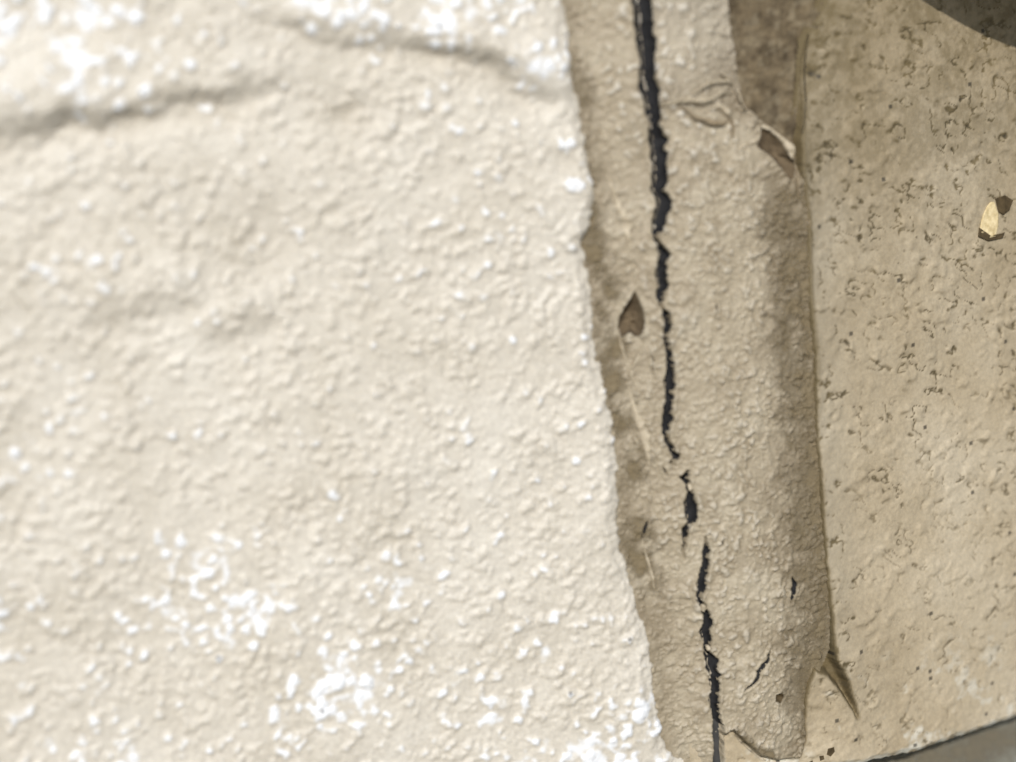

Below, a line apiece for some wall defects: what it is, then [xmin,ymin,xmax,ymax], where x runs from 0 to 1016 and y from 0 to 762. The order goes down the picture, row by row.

peeling [662,73,746,137]
peeling [736,125,800,197]
peeling [617,328,651,466]
crack [631,0,725,762]
crack [745,654,770,691]